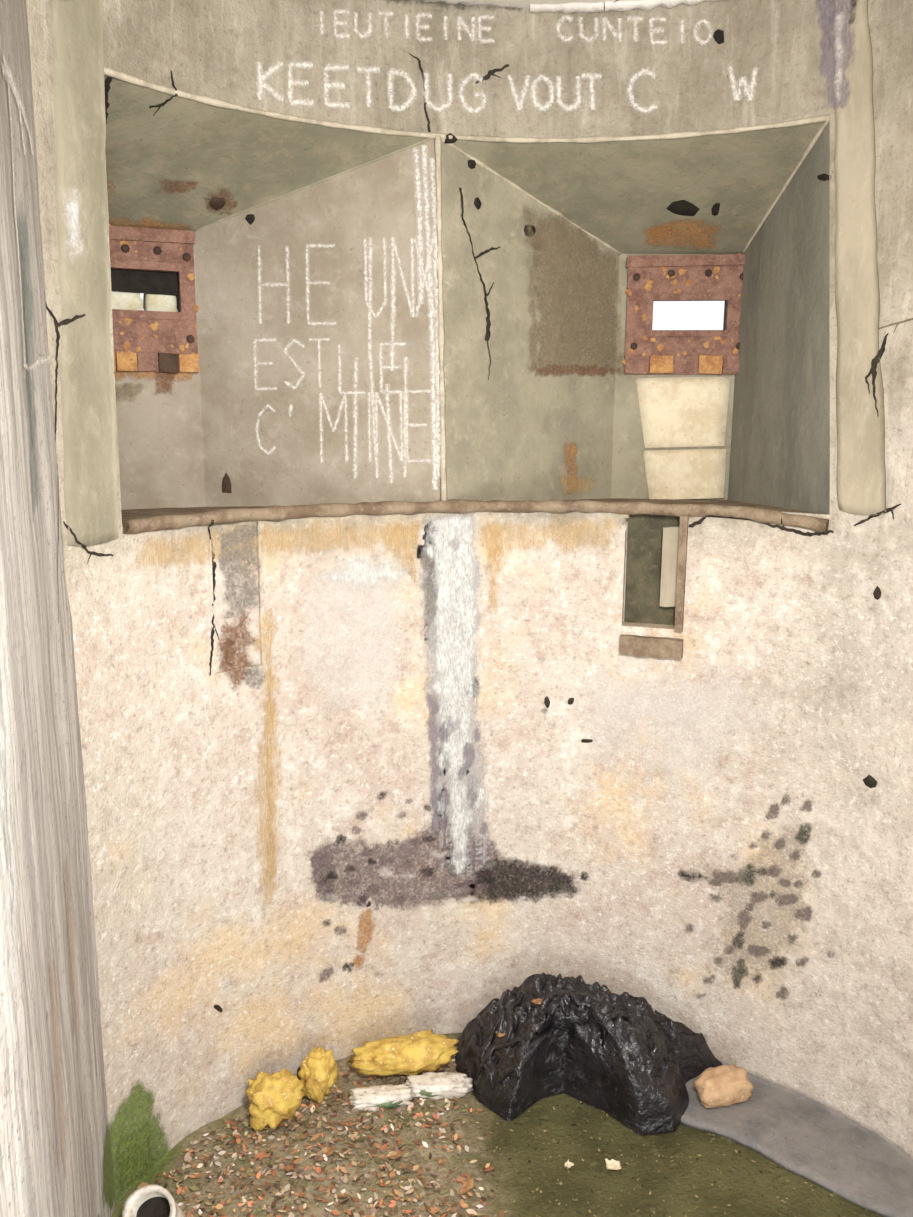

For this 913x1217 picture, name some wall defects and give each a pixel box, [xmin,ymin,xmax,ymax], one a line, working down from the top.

water stain [819,0,856,107]
crack [459,188,500,380]
crack [865,318,913,416]
water stain [303,515,588,910]